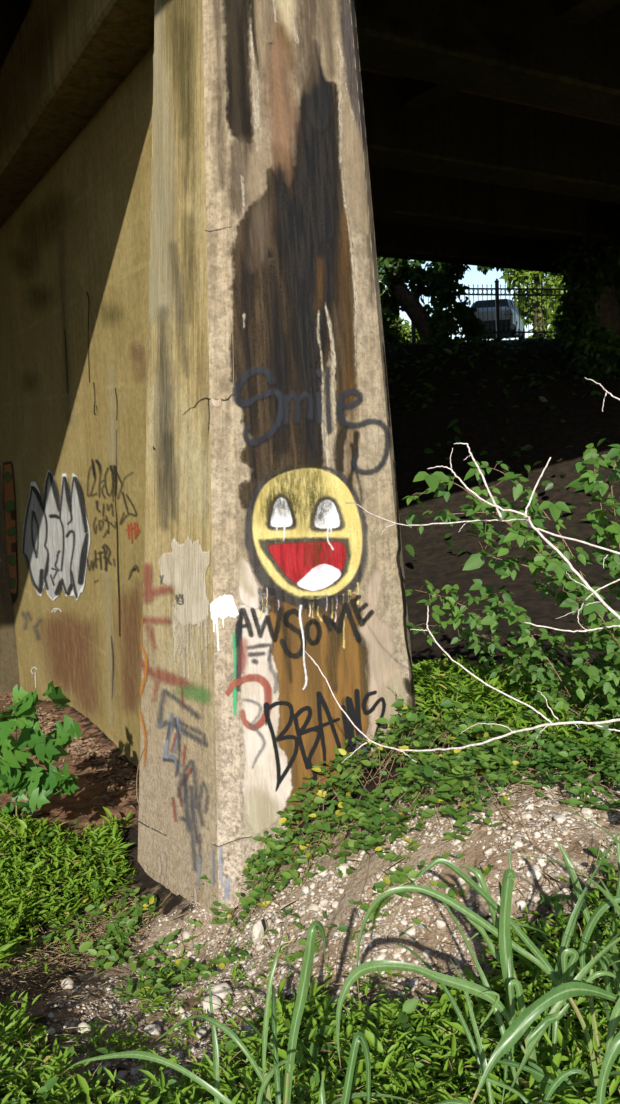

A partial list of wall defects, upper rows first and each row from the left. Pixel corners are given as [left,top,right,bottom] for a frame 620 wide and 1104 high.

crack [184,394,233,431]
water stain [217,0,373,509]